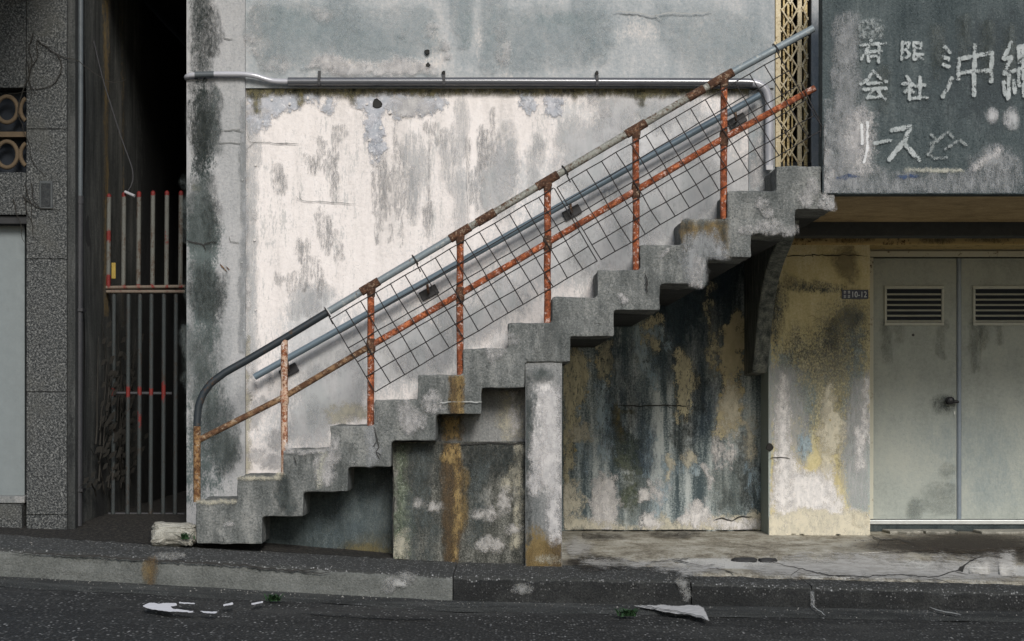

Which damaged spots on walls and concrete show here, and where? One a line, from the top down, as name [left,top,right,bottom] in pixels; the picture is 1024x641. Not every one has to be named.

damp [191,0,224,72]
peeling [350,92,471,225]
damp [478,132,517,218]
damp [183,82,444,561]
damp [568,155,744,490]
crack [373,428,395,548]
corrosion [437,375,469,562]
damp [464,341,870,567]
crack [773,553,985,582]